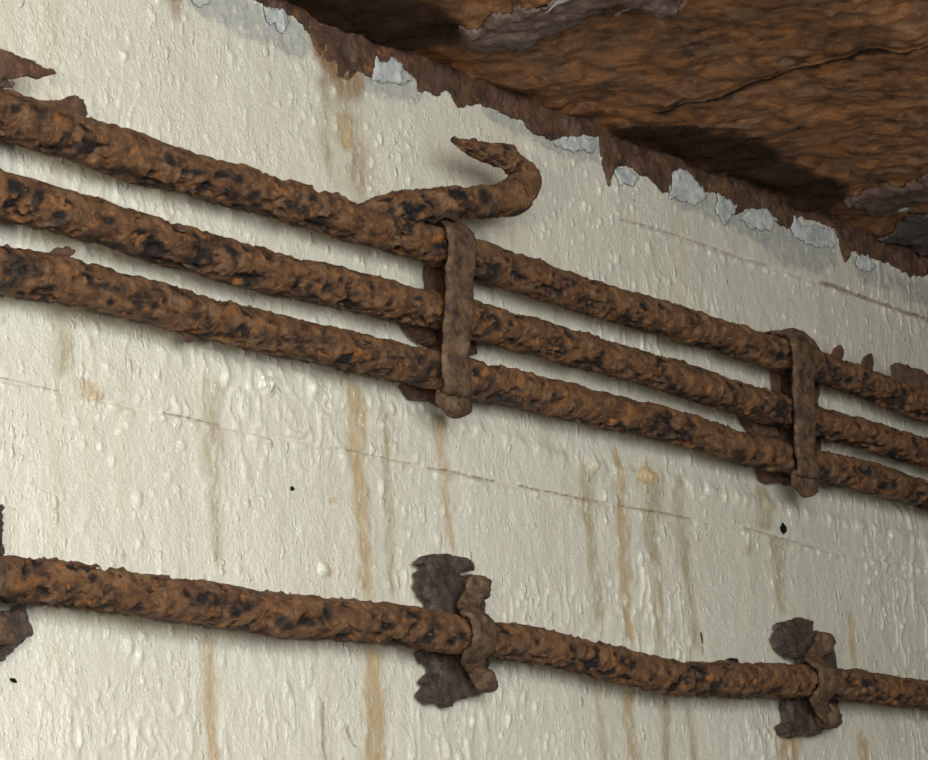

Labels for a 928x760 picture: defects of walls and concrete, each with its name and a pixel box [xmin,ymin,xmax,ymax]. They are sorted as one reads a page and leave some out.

rust [0,49,56,88]
rust [47,95,88,117]
rust [315,45,362,95]
crack [654,45,928,115]
peeling [192,0,928,304]
rust [831,345,844,359]
rust [860,353,874,371]
rust [890,362,928,390]
rust [349,389,369,589]
rust [618,502,634,637]
rust [206,655,217,760]
rust [367,649,384,760]